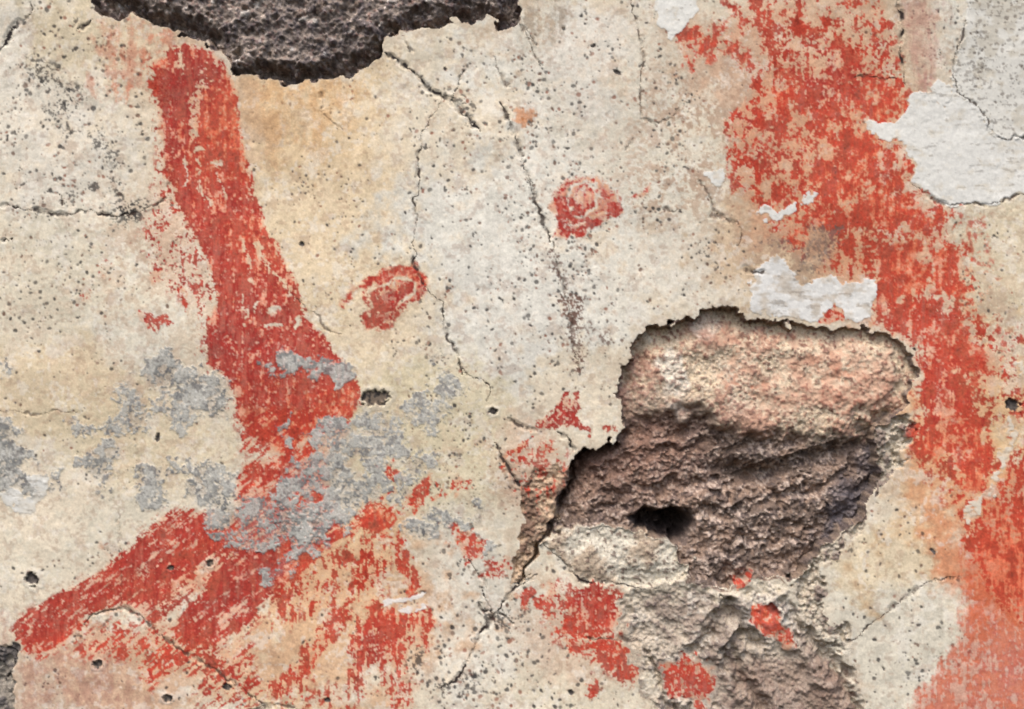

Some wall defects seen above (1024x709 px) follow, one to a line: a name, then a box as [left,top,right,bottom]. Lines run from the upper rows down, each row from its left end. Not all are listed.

spalling [91,0,522,87]
crack [518,22,543,66]
peeling [864,0,1024,209]
crack [0,193,166,218]
crack [385,40,491,401]
crack [494,56,581,375]
spalling [0,253,920,709]
crack [494,417,576,487]
crack [441,559,538,688]